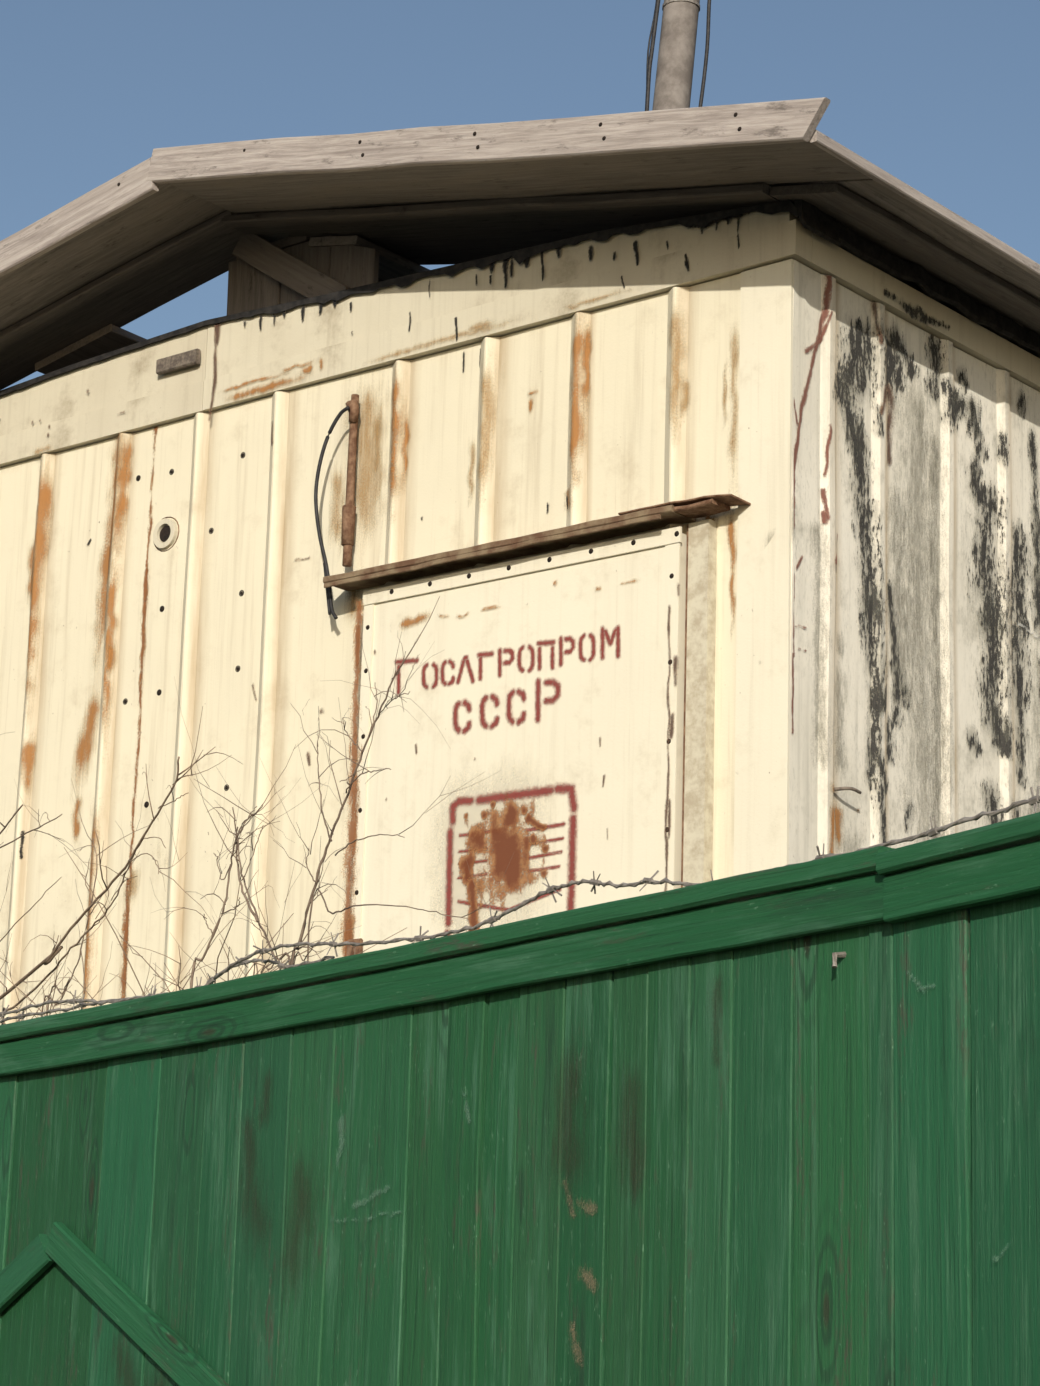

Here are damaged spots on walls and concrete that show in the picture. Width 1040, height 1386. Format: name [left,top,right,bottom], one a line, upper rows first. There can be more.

rust [332,379,410,535]
rust [469,378,491,492]
rust [566,328,591,507]
rust [671,318,689,414]
rust [26,475,53,693]
rust [75,435,132,775]
water stain [832,288,1040,847]
rust [21,742,36,788]
rust [340,590,375,957]
rust [73,800,99,1009]
rust [458,799,549,932]